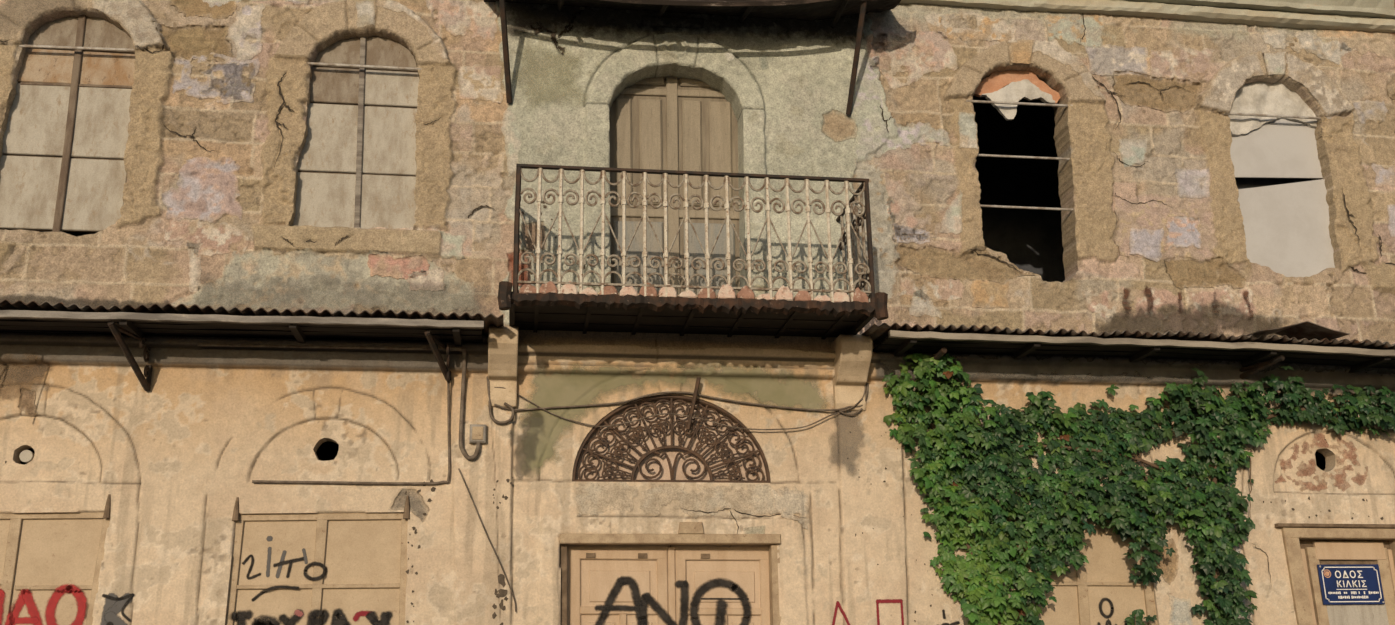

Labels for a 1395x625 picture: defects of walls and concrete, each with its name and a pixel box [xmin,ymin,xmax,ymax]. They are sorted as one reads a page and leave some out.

peeling [92,0,306,105]
crack [273,73,294,171]
peeling [355,0,522,177]
crack [530,11,581,55]
spalling [821,10,1395,319]
water stain [512,364,827,477]
spalling [1263,433,1384,520]